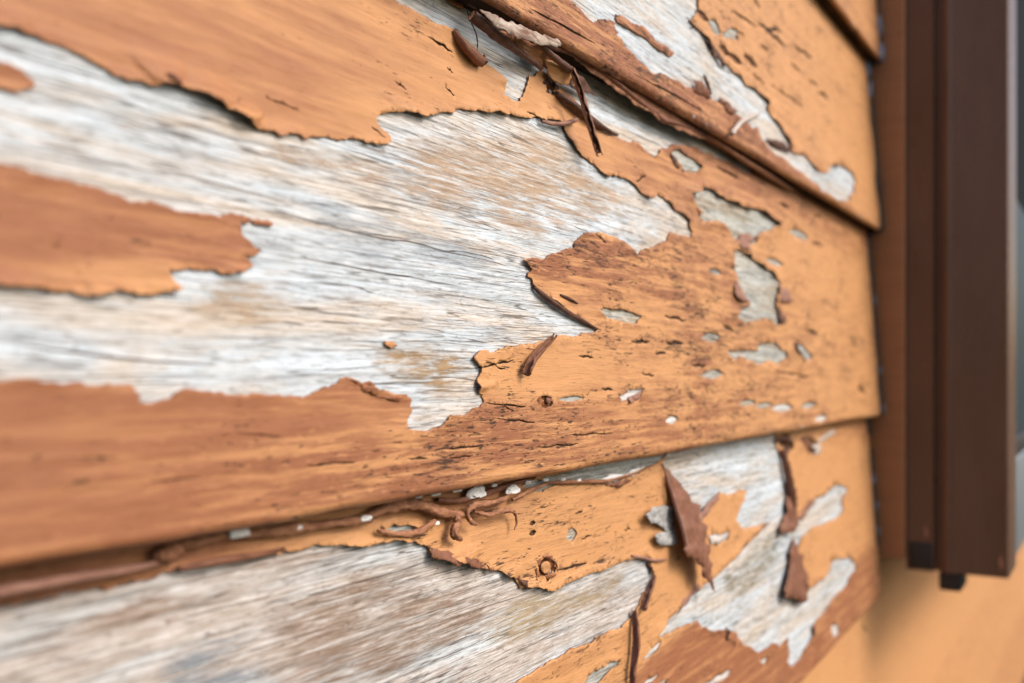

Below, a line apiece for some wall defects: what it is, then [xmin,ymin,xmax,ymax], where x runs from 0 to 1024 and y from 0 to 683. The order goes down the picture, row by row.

peeling [0,0,811,431]
peeling [570,0,855,201]
peeling [0,400,855,683]